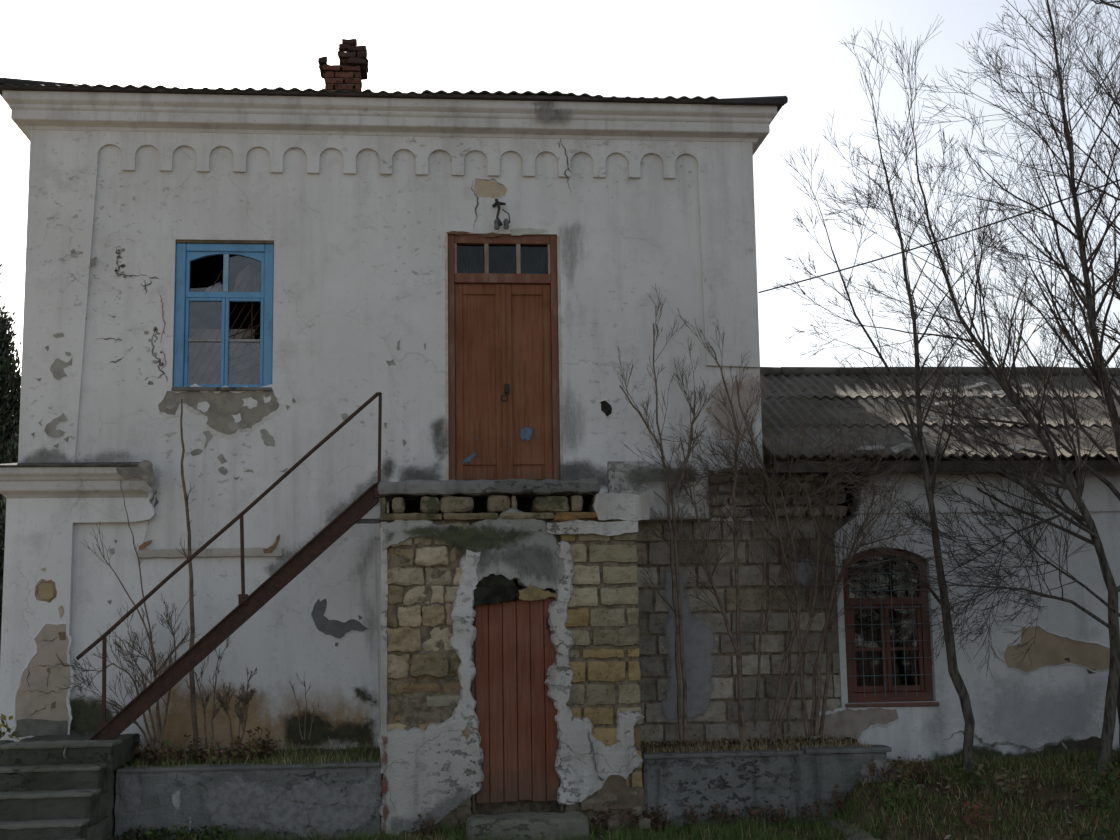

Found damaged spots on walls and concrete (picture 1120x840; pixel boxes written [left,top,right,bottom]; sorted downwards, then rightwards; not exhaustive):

peeling [473,177,508,199]
crack [95,246,168,385]
peeling [36,333,74,382]
peeling [31,412,69,448]
peeling [154,384,296,456]
peeling [217,454,254,480]
spalling [12,567,74,739]
peeling [310,597,371,647]
spalling [385,522,470,707]
spalling [473,467,901,812]
peeling [1002,624,1110,675]